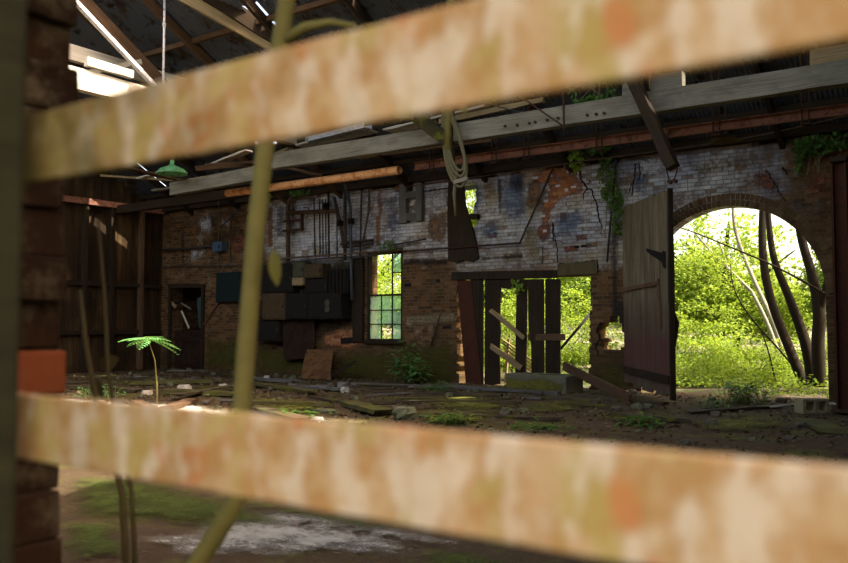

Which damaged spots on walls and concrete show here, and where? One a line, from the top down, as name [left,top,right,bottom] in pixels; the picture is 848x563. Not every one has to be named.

spalling [526,167,584,242]
crack [579,171,603,228]
crack [629,163,641,196]
crack [765,166,788,202]
spalling [564,234,597,252]